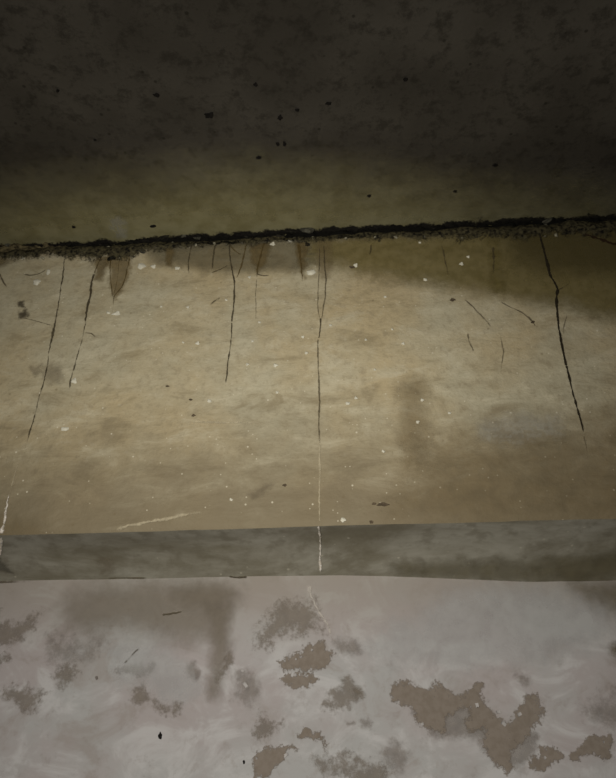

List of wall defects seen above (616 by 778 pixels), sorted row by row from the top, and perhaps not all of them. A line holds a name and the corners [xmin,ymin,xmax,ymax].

crack [25,263,64,437]
crack [69,258,101,387]
crack [212,243,267,381]
damp [0,200,616,312]
crack [298,245,327,466]
crack [539,234,584,430]
crack [0,497,9,555]
crack [308,487,330,632]
peeling [243,719,327,778]
peeling [278,640,333,689]
peeling [390,679,546,775]
peeling [528,734,613,772]